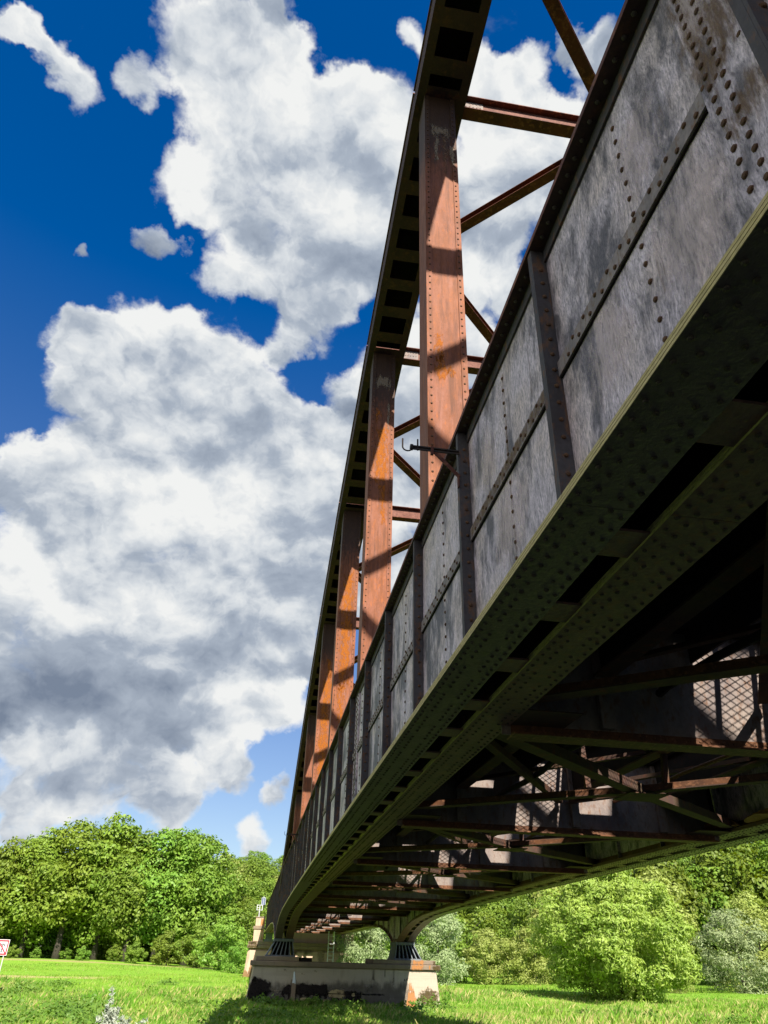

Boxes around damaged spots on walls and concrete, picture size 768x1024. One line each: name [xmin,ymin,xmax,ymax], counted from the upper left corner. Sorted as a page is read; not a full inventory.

rust [373,410,389,523]
rust [317,571,355,772]
leakage [242,967,405,1005]